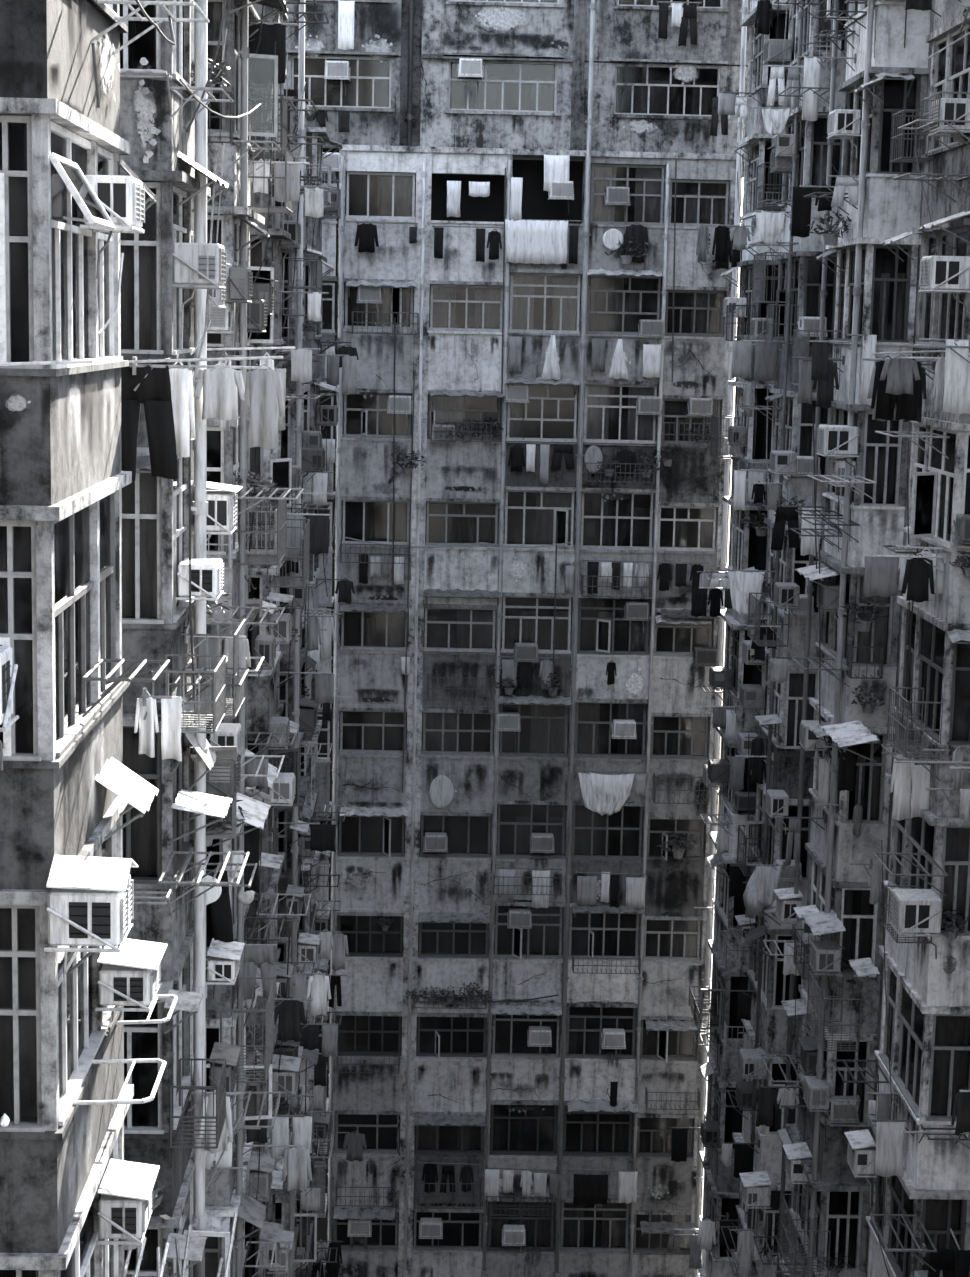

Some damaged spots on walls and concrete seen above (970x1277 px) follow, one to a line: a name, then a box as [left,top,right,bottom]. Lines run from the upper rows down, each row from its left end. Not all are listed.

damp [432,661,560,700]
damp [465,765,486,792]
damp [540,767,562,801]
damp [338,1259,398,1277]